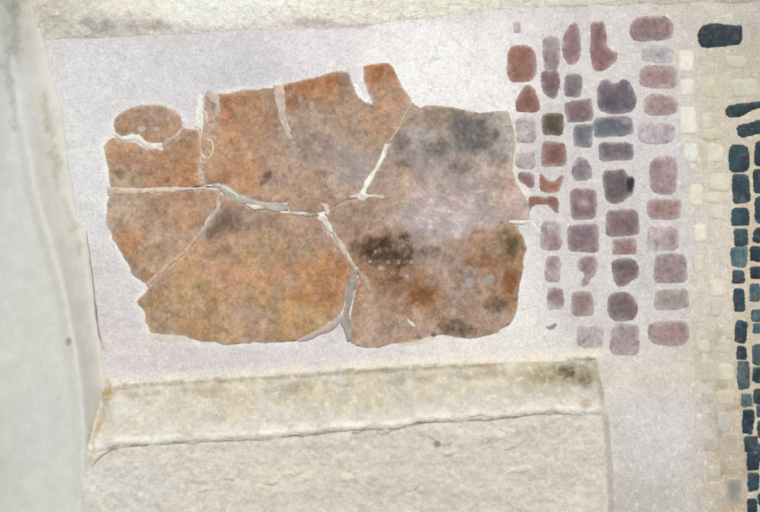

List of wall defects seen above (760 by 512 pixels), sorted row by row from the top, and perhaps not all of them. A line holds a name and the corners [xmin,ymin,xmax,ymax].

crack [91,413,585,467]